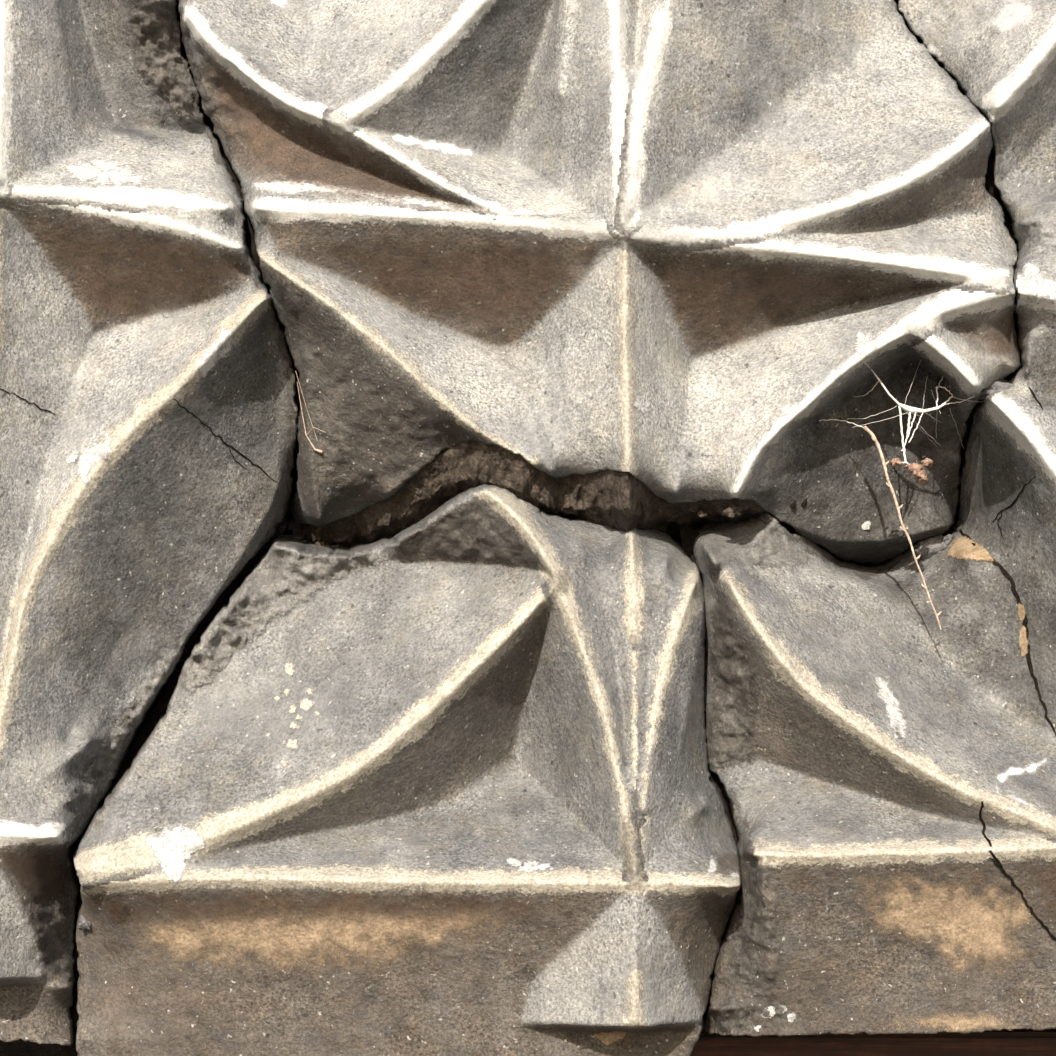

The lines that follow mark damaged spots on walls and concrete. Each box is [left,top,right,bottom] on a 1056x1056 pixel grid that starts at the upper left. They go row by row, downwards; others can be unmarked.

crack [165,0,270,293]
crack [0,388,55,415]
crack [173,324,301,510]
crack [894,0,1056,736]
crack [678,523,702,579]
crack [780,522,917,581]
crack [102,535,278,803]
crack [709,770,738,845]
crack [61,840,82,1056]
leakage [875,877,1029,968]